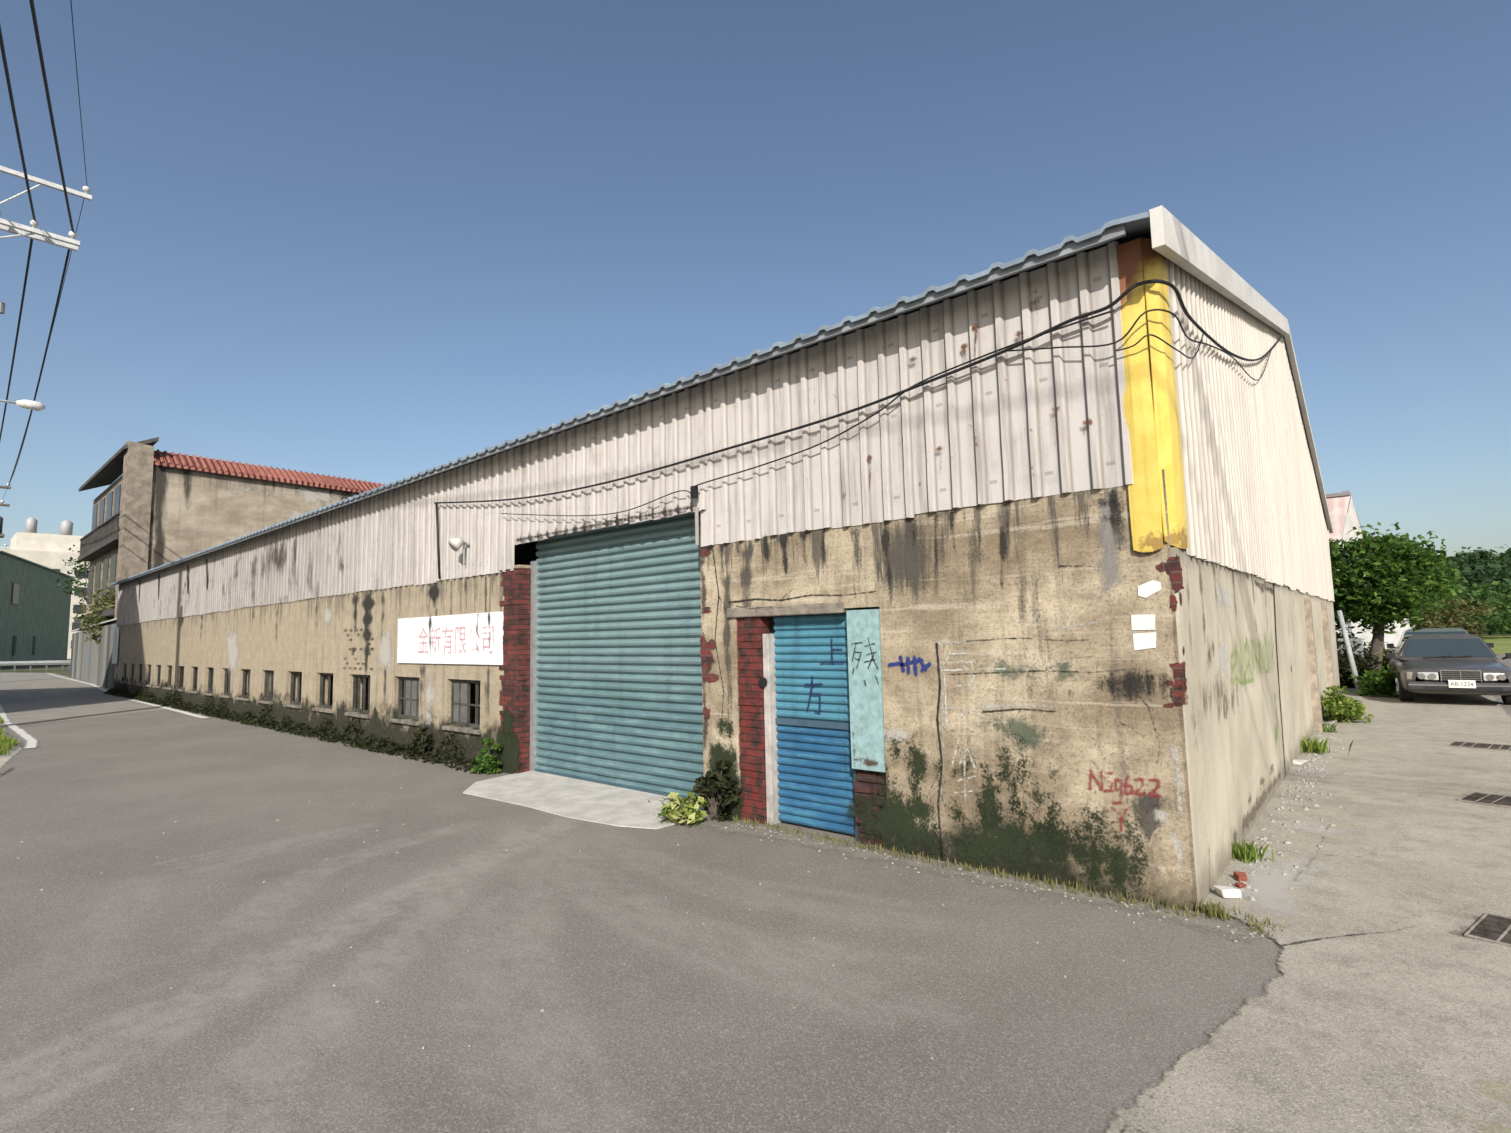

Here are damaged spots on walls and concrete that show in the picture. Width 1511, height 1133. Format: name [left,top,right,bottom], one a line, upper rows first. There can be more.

damp [1099,490,1124,549]
damp [851,512,981,599]
damp [999,526,1008,586]
spalling [1156,556,1184,611]
damp [352,590,386,704]
damp [720,528,826,714]
damp [1107,671,1166,699]
spalling [1161,647,1189,708]
damp [1132,795,1170,838]